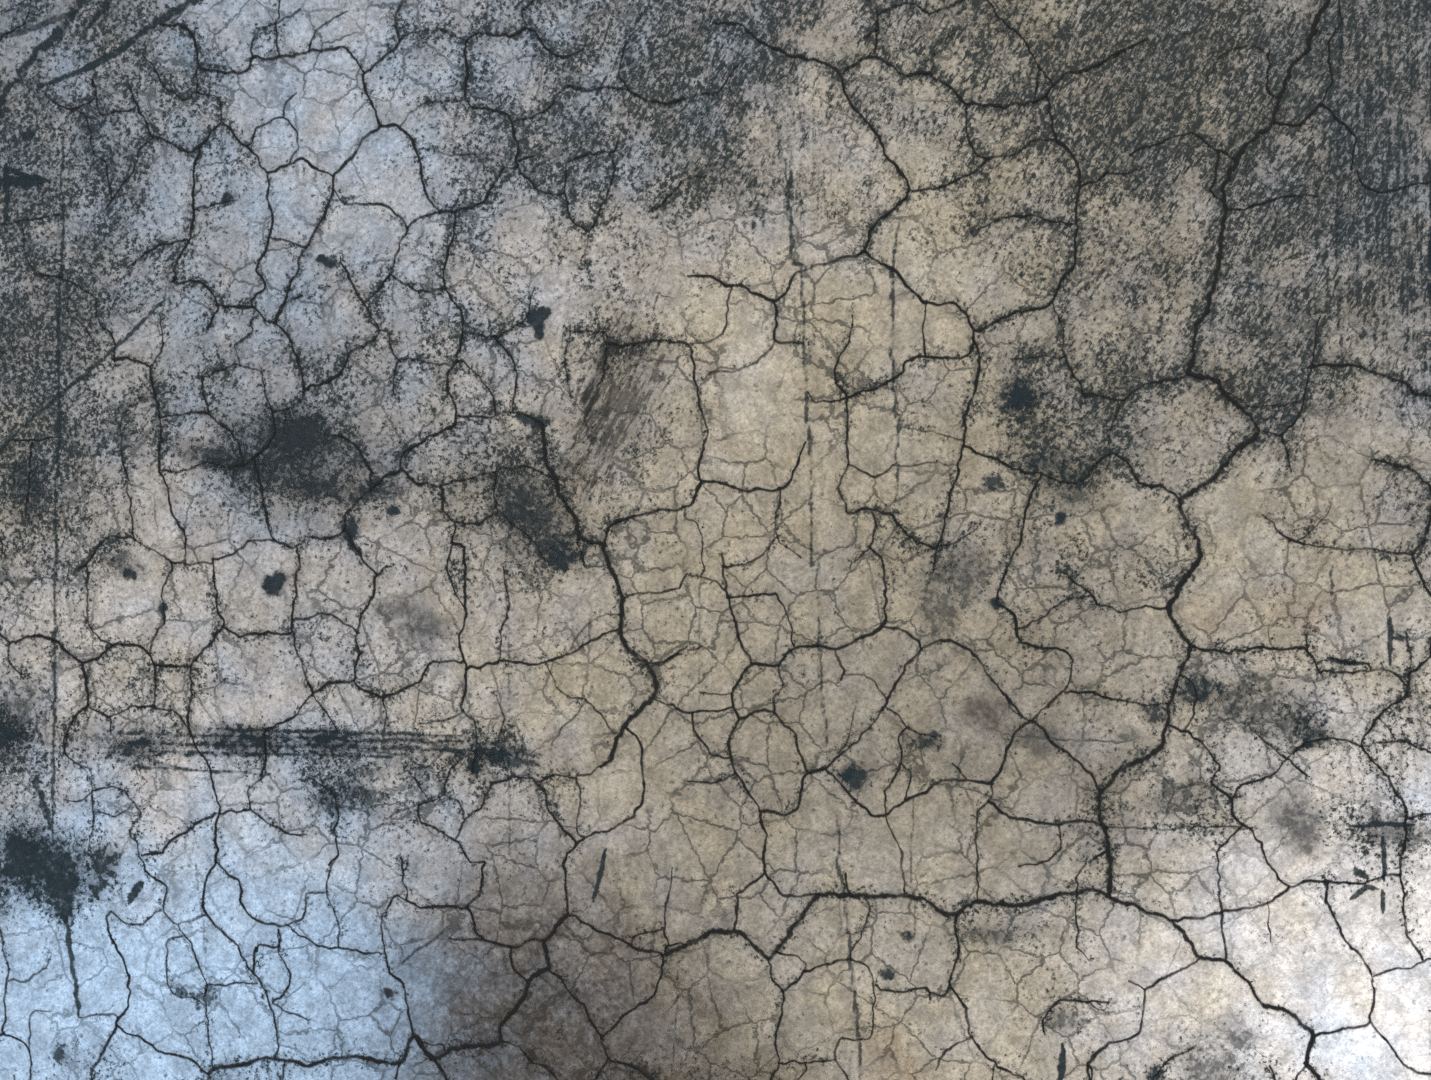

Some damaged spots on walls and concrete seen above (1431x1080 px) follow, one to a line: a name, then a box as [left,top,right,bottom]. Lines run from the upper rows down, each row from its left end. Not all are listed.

crack [0,0,31,40]
crack [0,213,60,238]
crack [50,79,138,209]
crack [687,0,1178,572]
water stain [162,399,403,556]
crack [128,0,985,983]
crack [995,0,1431,977]
crack [0,273,1431,1080]
water stain [0,775,144,1018]